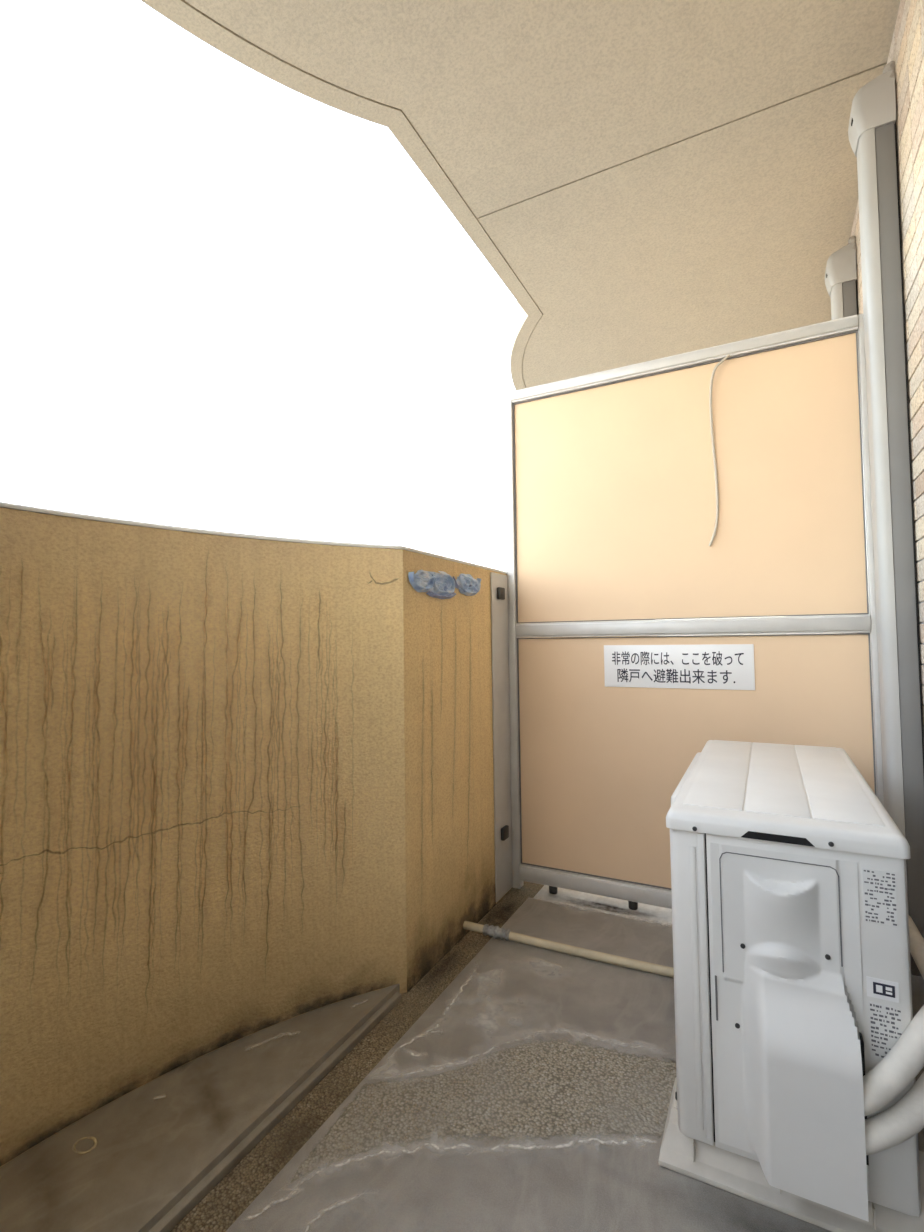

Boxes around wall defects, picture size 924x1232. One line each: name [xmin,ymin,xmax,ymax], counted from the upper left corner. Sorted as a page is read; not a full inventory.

leakage [159,1023,277,1076]
leakage [385,966,501,1078]